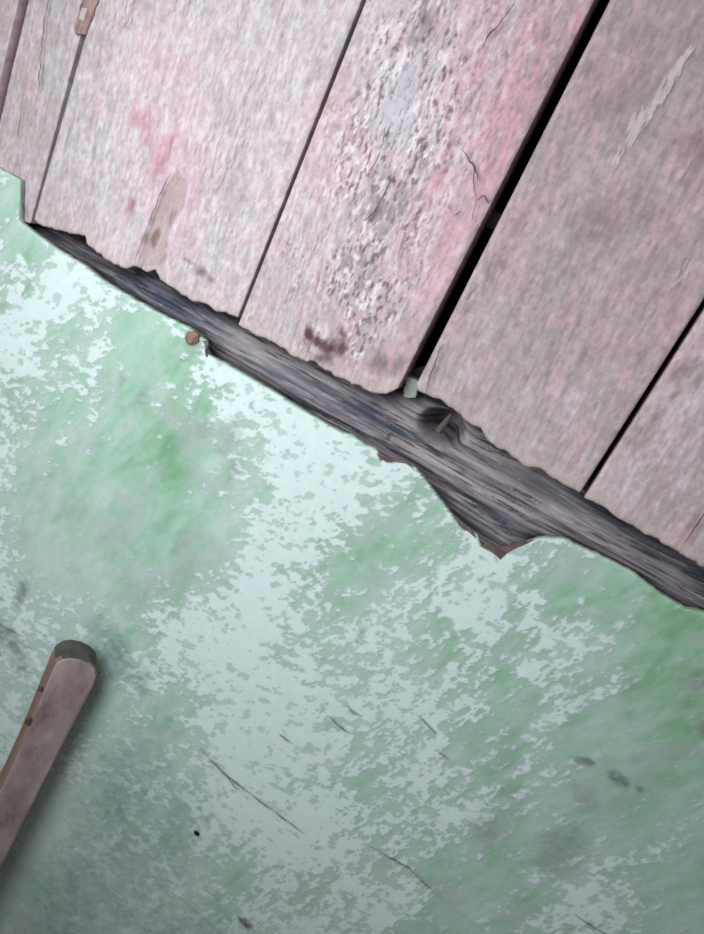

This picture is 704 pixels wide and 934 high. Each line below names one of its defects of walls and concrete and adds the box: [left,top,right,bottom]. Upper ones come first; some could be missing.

peeling [612,46,694,167]
peeling [0,241,189,500]
peeling [0,338,704,934]
crack [199,747,304,834]